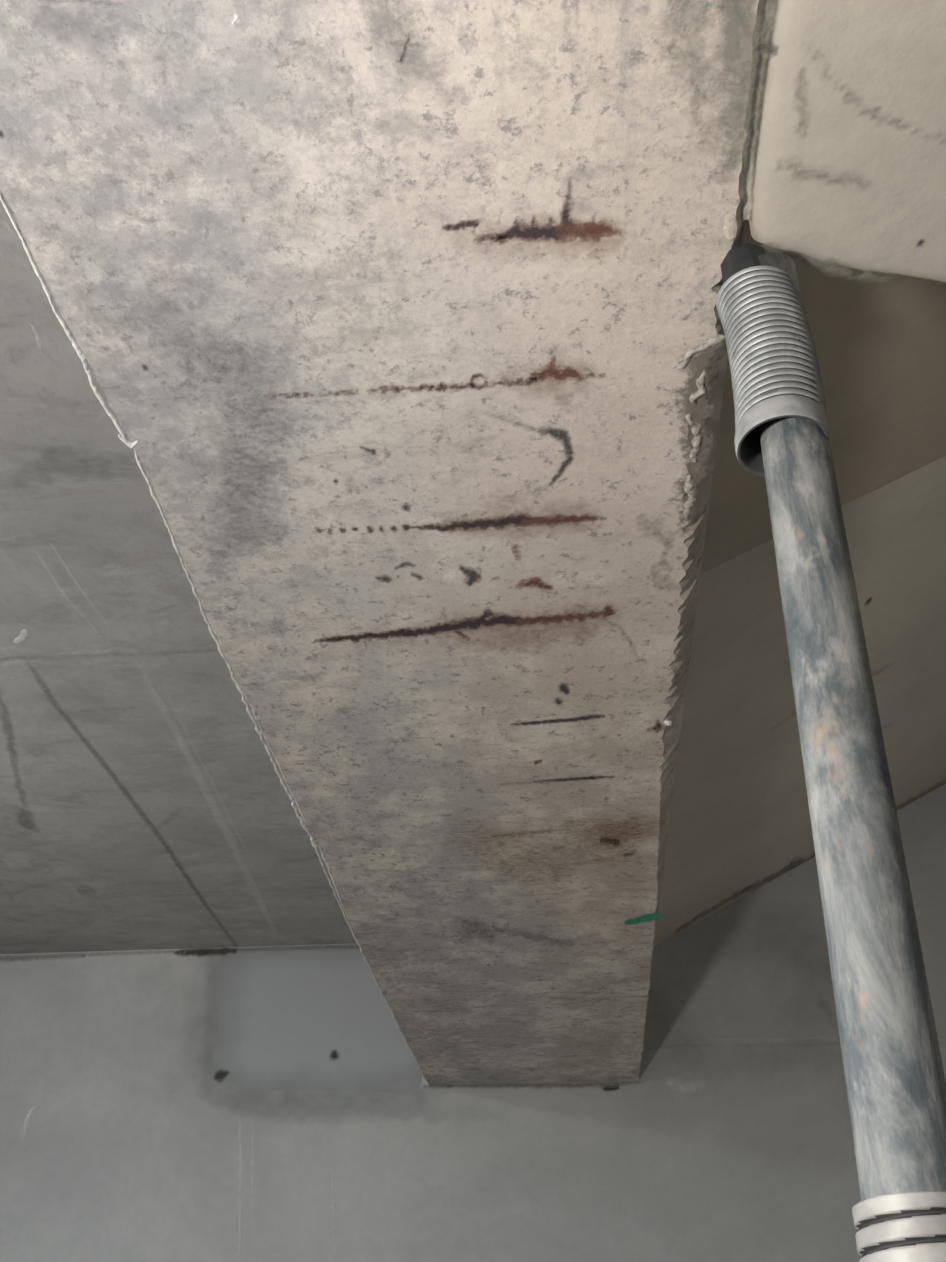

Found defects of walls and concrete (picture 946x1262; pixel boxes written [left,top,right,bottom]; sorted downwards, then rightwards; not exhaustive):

corrosion [443,186,617,244]
corrosion [372,357,602,393]
corrosion [317,514,606,534]
corrosion [314,606,615,643]